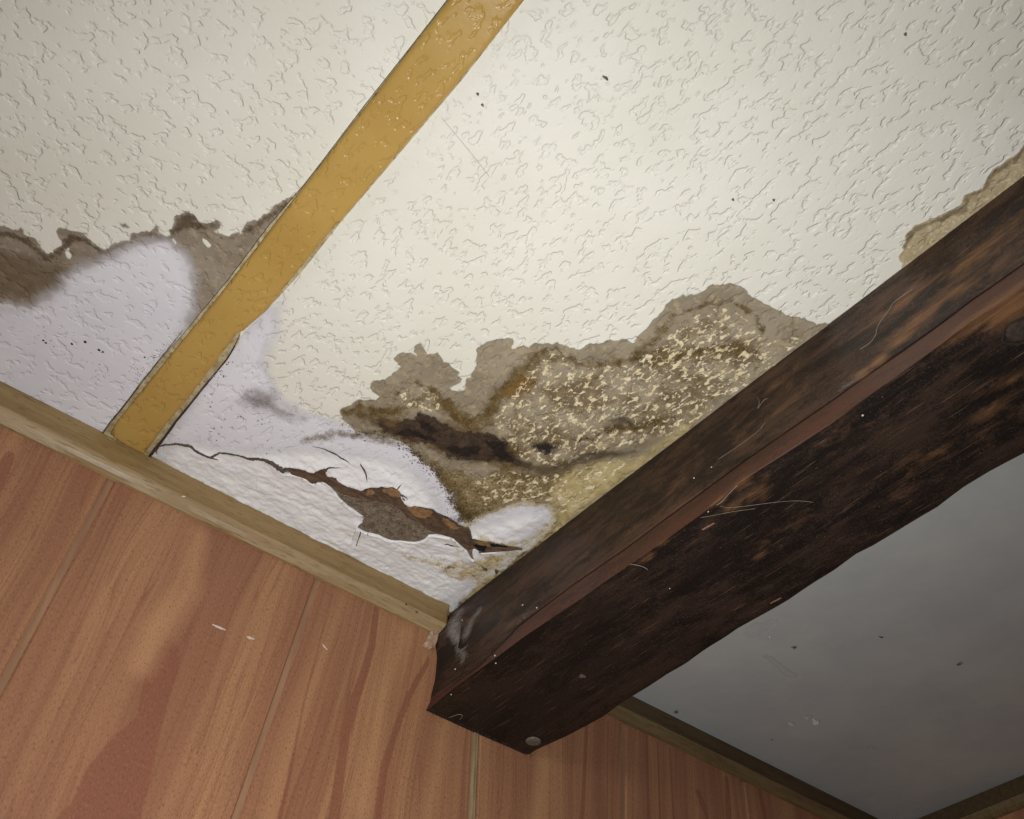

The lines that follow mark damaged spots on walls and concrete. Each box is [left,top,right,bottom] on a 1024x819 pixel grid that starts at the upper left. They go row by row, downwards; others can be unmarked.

leakage [899,145,1024,268]
leakage [0,196,293,365]
crack [156,443,286,474]
leakage [246,393,285,425]
crack [316,447,367,480]
leakage [305,283,829,606]
spalling [283,467,522,560]